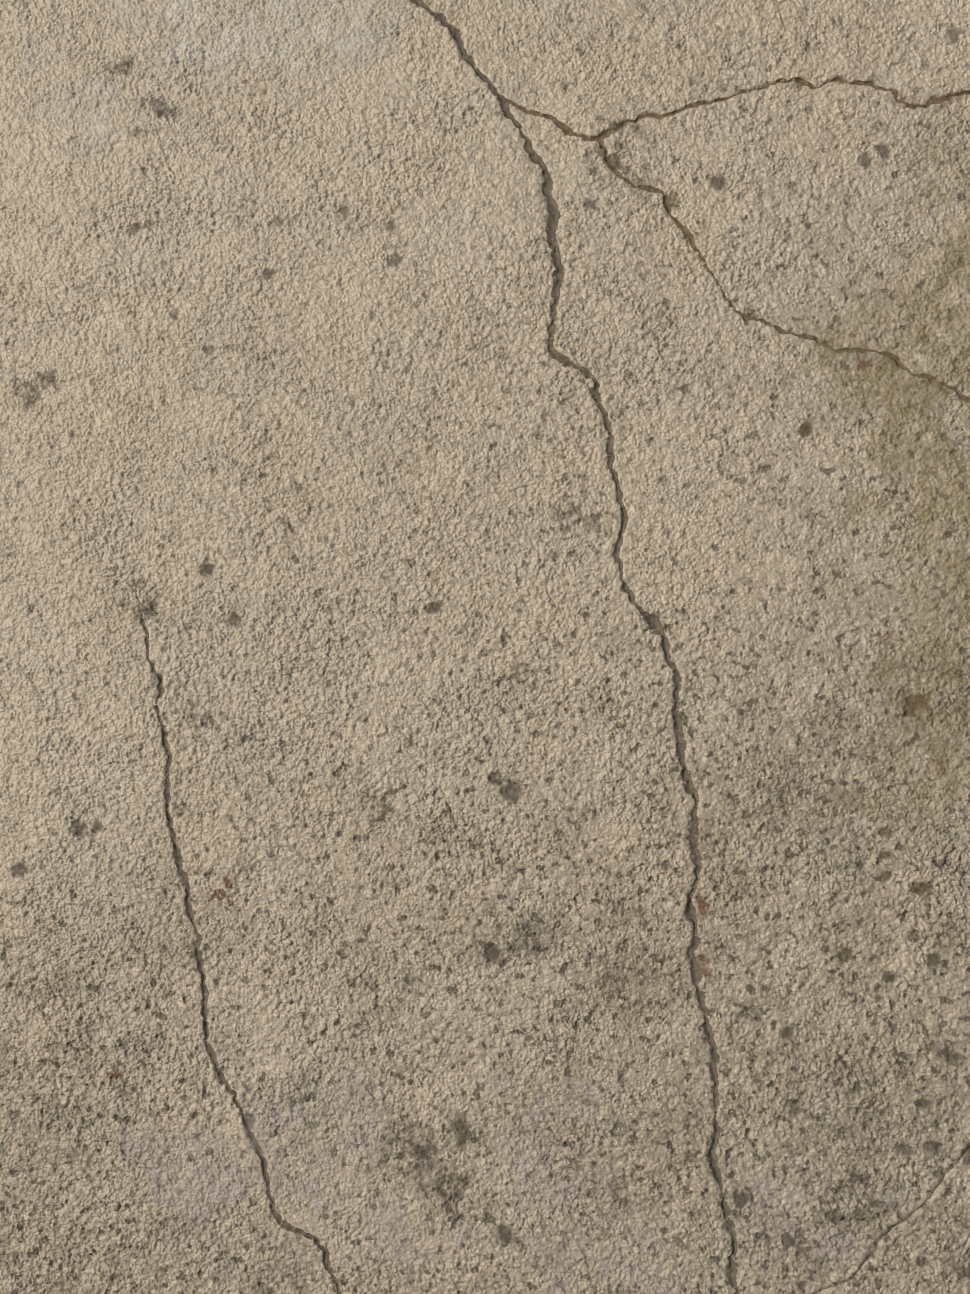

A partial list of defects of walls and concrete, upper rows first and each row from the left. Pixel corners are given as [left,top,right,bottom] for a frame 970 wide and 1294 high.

crack [133,578,341,1294]
crack [409,0,970,1294]